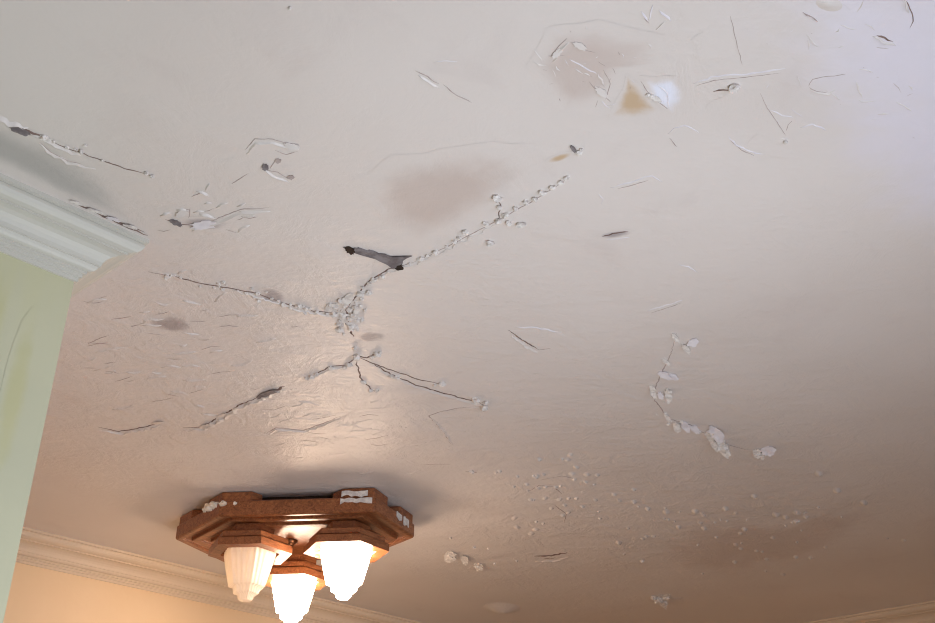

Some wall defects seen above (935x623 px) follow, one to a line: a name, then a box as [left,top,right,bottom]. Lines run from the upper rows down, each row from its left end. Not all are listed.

peeling [633,76,686,116]
leakage [0,119,152,231]
crack [0,116,154,178]
peeling [245,138,300,183]
peeling [641,0,935,296]
crack [70,200,148,236]
peeling [158,183,270,233]
crack [99,176,570,445]